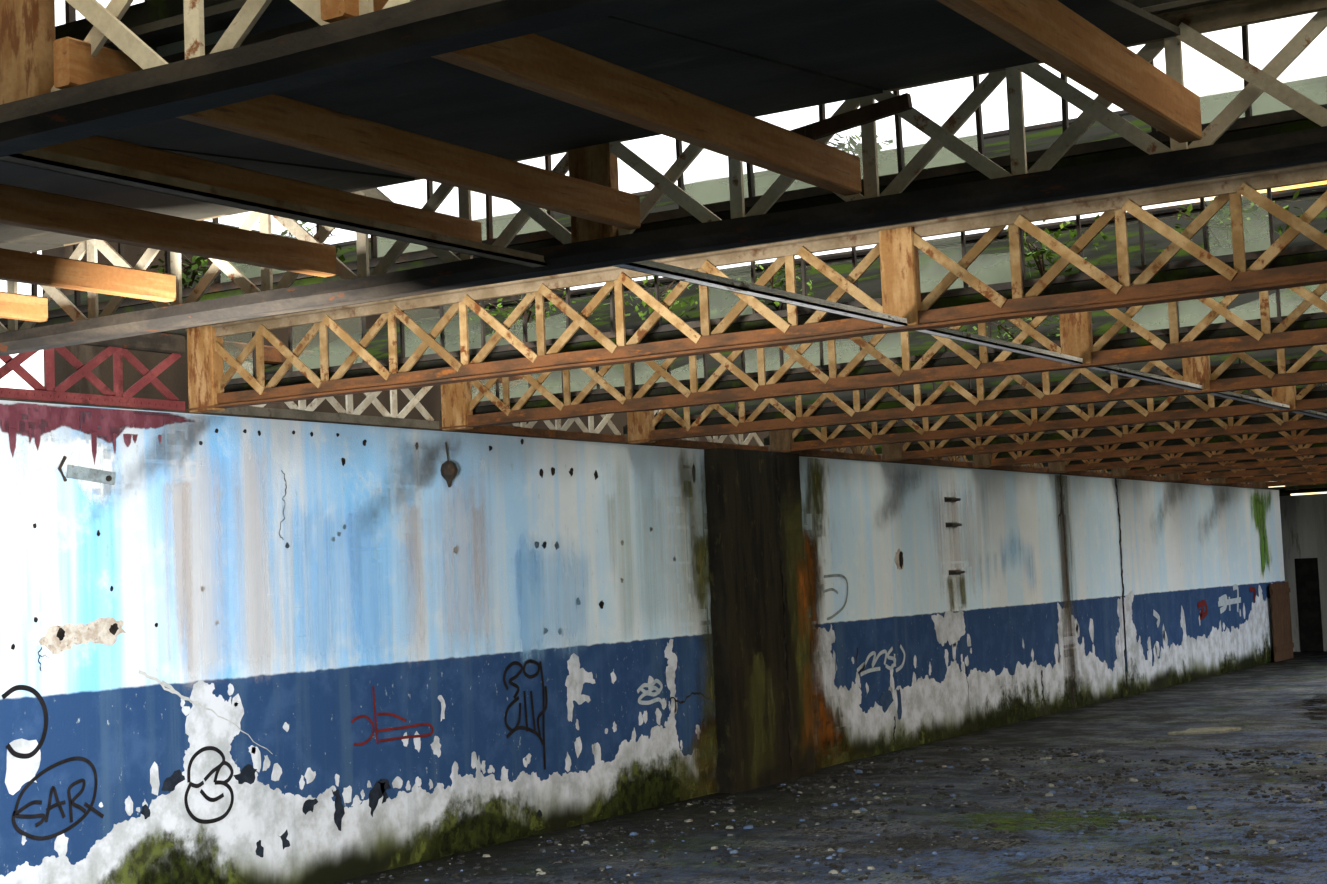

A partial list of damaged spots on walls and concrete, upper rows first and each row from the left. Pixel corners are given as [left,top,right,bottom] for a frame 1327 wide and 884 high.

water stain [8,428,138,500]
water stain [1255,499,1265,571]
flaking render [34,617,126,655]
peeling [0,639,717,884]
corrosion [786,502,848,762]
peeling [811,583,1274,768]